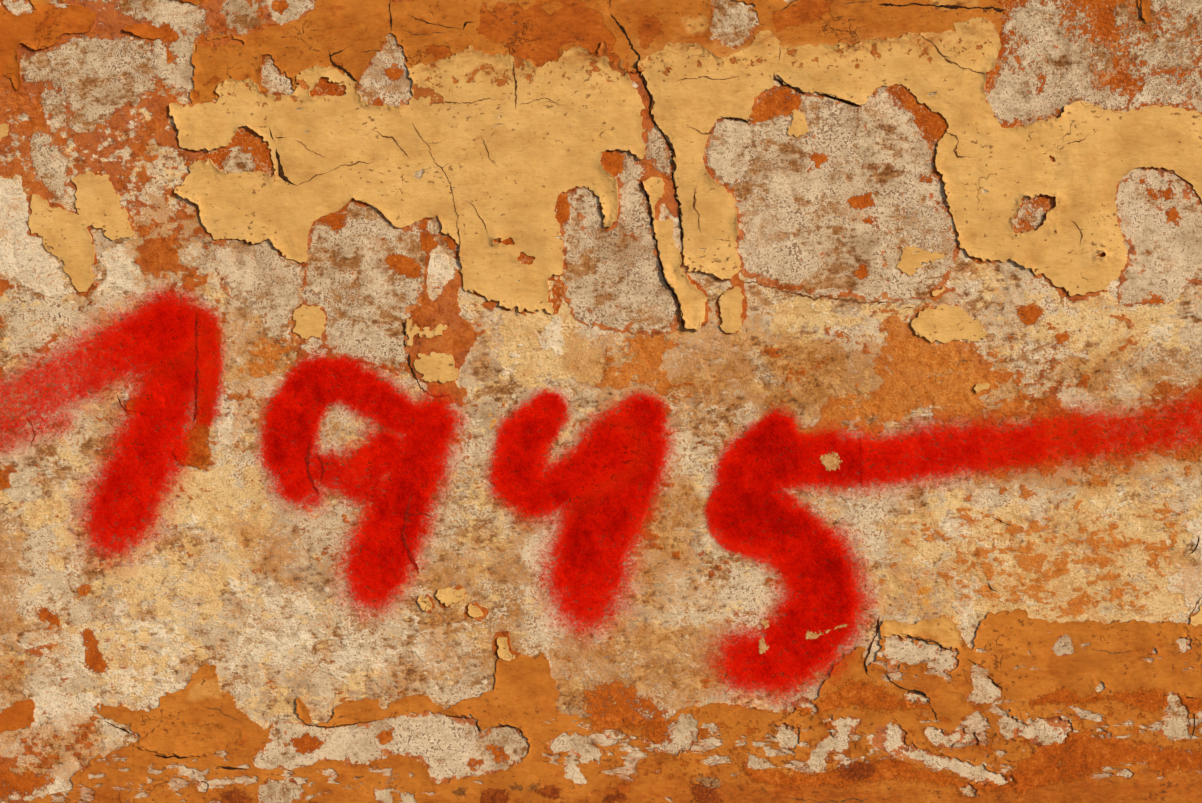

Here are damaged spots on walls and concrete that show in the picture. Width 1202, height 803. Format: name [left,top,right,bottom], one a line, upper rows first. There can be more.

peeling [0,0,1202,384]
crack [609,0,749,327]
crack [774,51,862,107]
peeling [178,389,213,469]
peeling [0,601,1202,803]